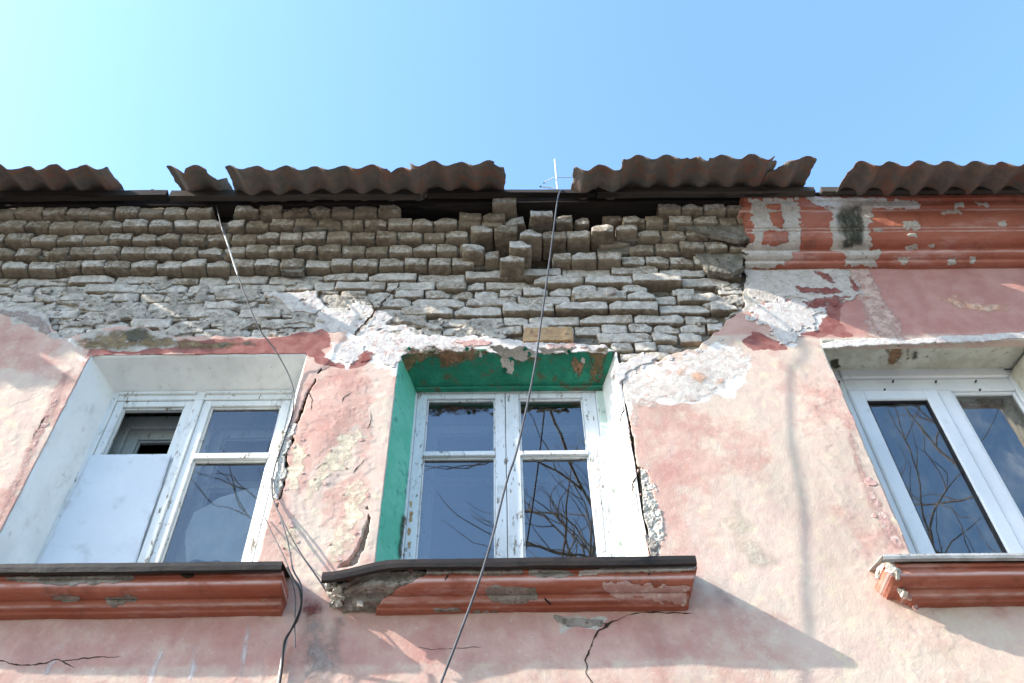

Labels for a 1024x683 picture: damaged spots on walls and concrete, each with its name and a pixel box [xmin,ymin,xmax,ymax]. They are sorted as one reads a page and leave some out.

damp [837,206,864,248]
peeling [941,202,989,215]
spalling [0,196,935,425]
crack [271,365,334,507]
peeling [283,429,367,501]
crack [620,383,650,575]
peeling [329,480,370,561]
peeling [426,465,696,614]
peeling [5,574,135,603]
spalling [322,582,372,609]
crack [0,656,121,667]
crack [584,611,689,683]